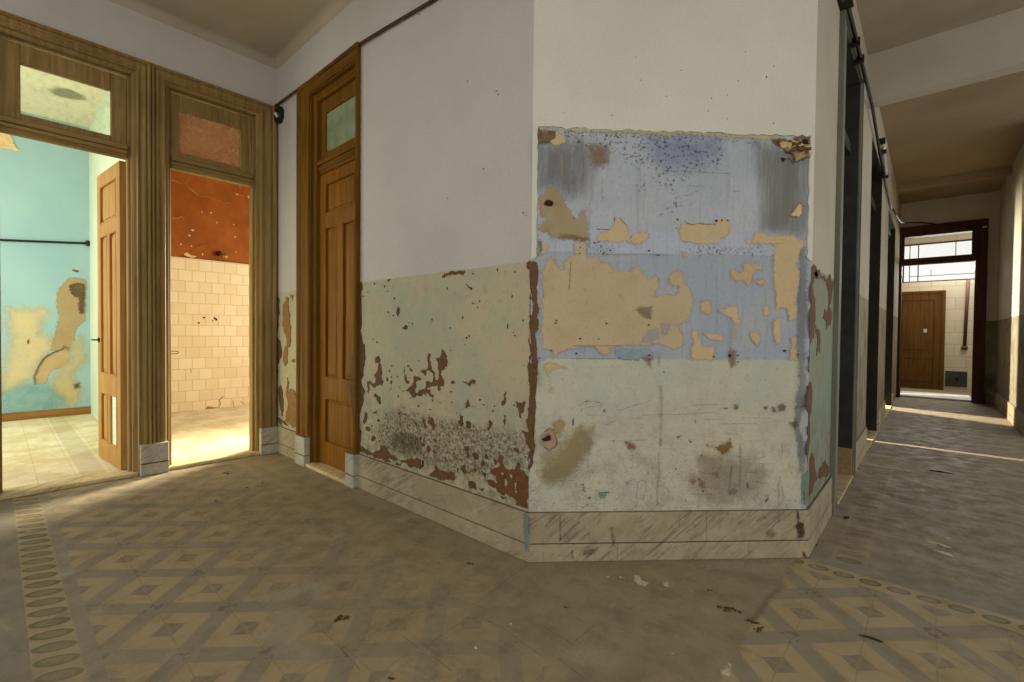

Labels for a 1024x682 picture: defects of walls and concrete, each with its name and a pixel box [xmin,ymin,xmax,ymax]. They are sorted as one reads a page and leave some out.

leakage [540,129,803,228]
spalling [537,123,812,163]
peeling [4,269,87,403]
peeling [277,294,296,428]
peeling [349,187,741,508]
peeling [731,232,833,496]
leakage [381,412,524,474]
leakage [536,419,624,506]